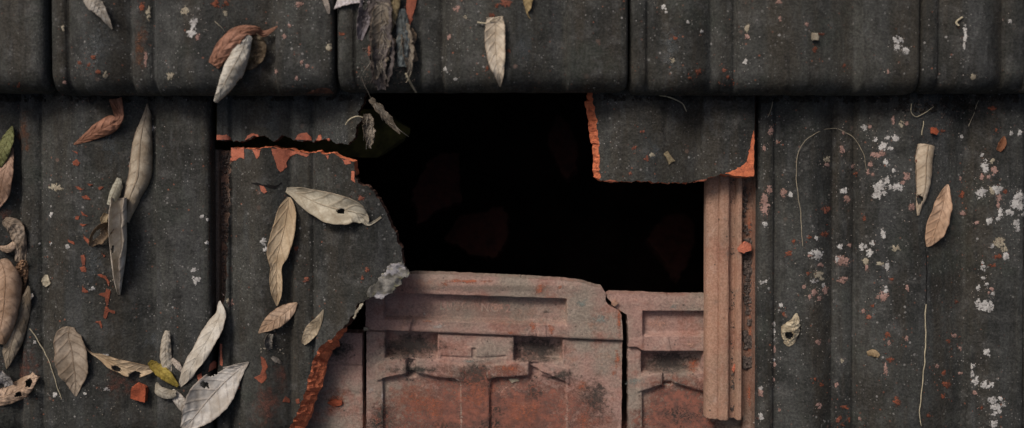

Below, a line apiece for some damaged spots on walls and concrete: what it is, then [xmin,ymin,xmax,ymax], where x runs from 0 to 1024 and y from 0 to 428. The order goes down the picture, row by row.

spalling [584,67,755,185]
spalling [197,81,405,428]
peeling [737,241,752,253]